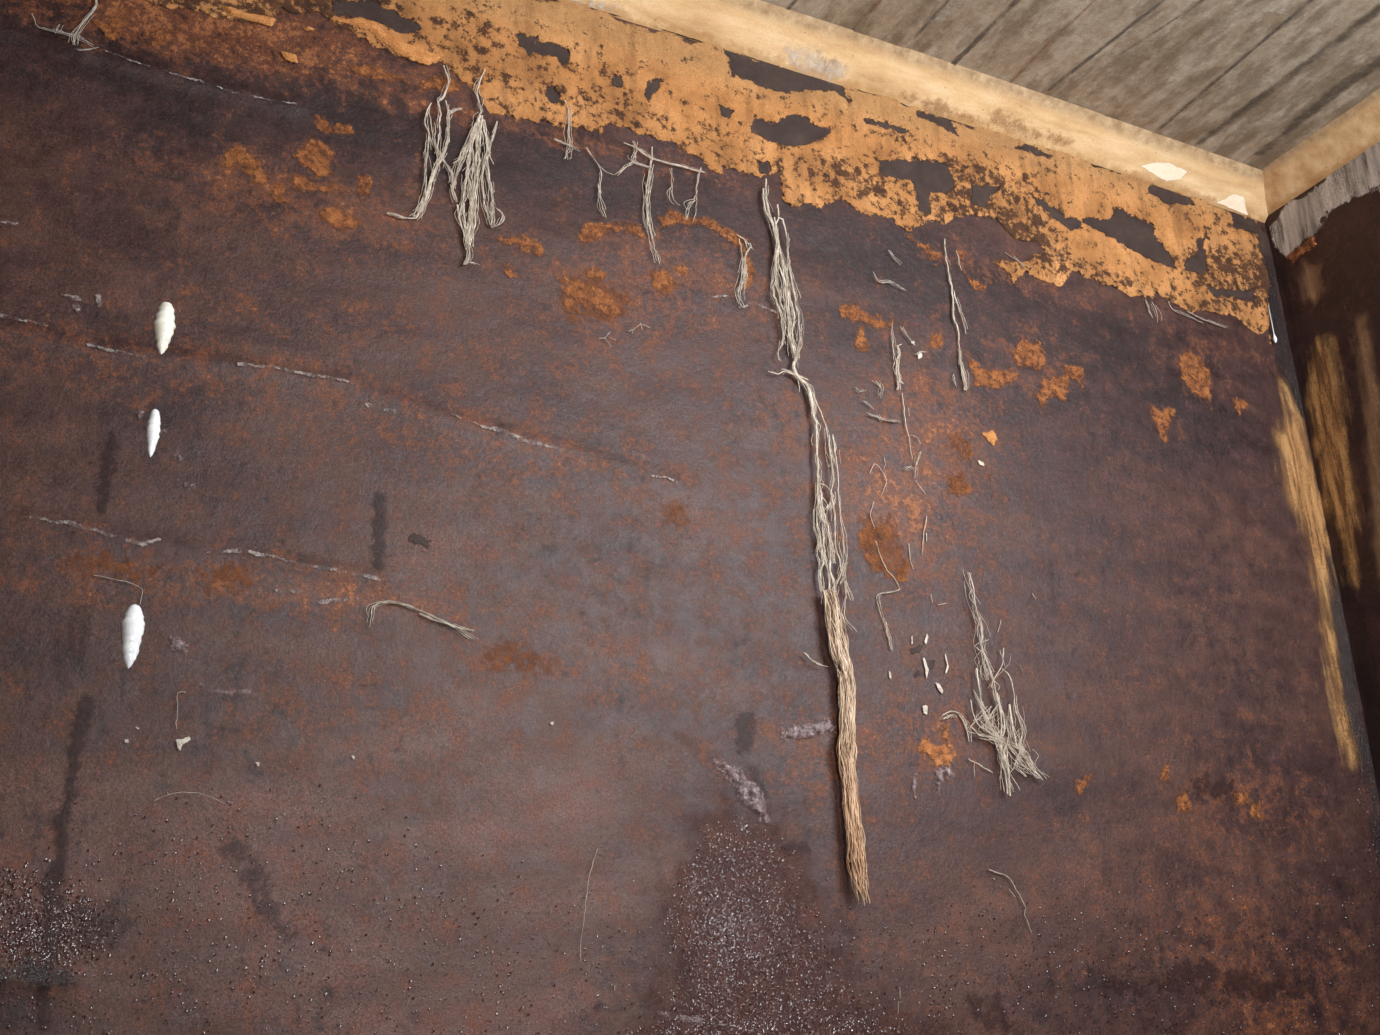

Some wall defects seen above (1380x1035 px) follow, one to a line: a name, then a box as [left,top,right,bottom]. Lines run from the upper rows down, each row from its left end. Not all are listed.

peeling [92,0,127,40]
flaking render [146,0,1380,344]
water stain [1267,259,1304,418]
corrosion [1303,268,1320,299]
water stain [372,492,387,569]
corrosion [1276,318,1380,763]
water stain [0,556,1380,1035]